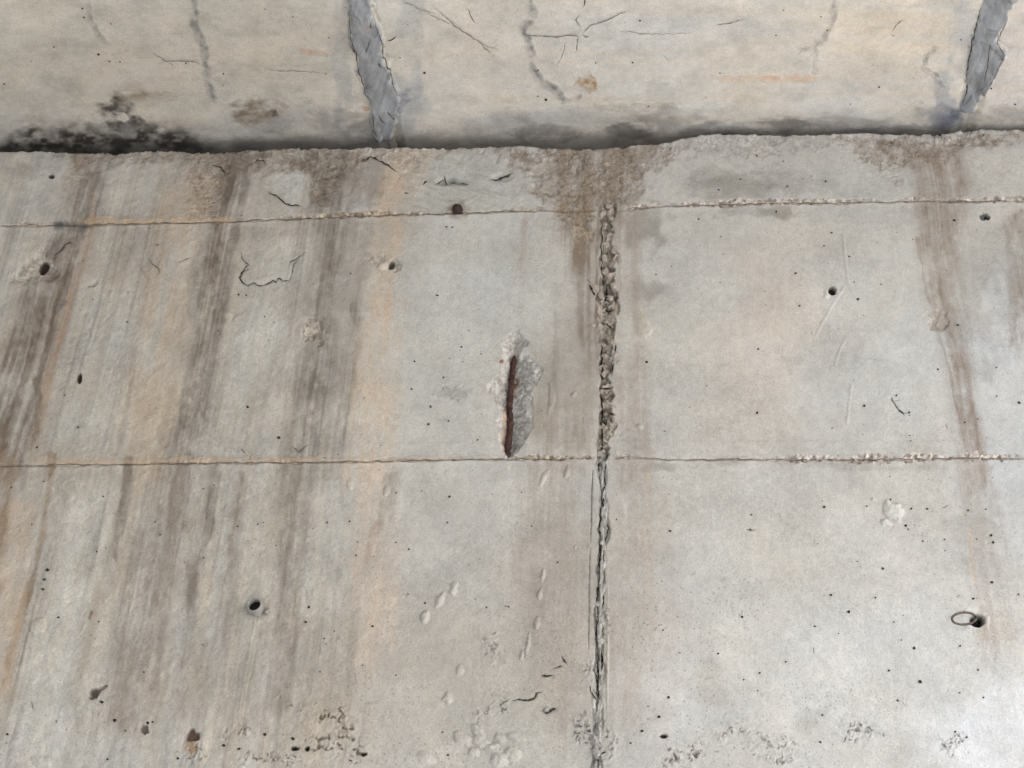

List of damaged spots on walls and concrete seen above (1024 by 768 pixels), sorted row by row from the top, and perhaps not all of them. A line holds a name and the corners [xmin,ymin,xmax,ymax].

crack [406,3,491,54]
crack [527,0,689,62]
crack [962,8,1008,103]
leakage [0,85,233,159]
crack [349,17,510,194]
corrosion [444,197,473,223]
crack [239,252,305,287]
leakage [0,158,664,757]
corrosion [497,378,521,453]
spalling [484,327,545,459]
leakage [905,147,1024,676]
crack [588,465,602,733]